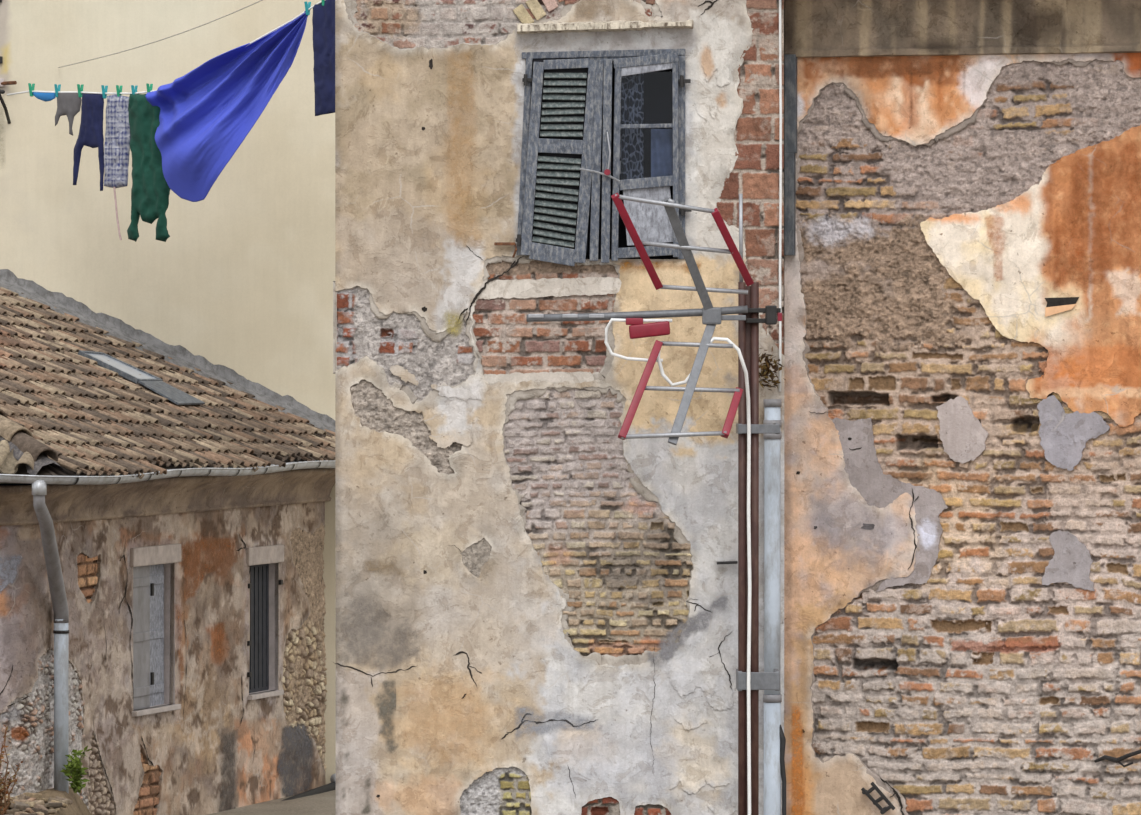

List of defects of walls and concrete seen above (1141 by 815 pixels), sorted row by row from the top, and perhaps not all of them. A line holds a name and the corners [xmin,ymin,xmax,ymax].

flaking render [344,0,580,69]
crack [699,0,717,15]
crack [458,245,523,322]
flaking render [702,0,1141,815]
flaking render [333,255,694,667]
flaking render [282,522,327,772]
crack [333,662,418,687]
crack [455,651,481,699]
flaking render [0,647,54,797]
flaking render [68,662,117,815]
crack [502,713,598,739]
flaking render [460,766,532,815]